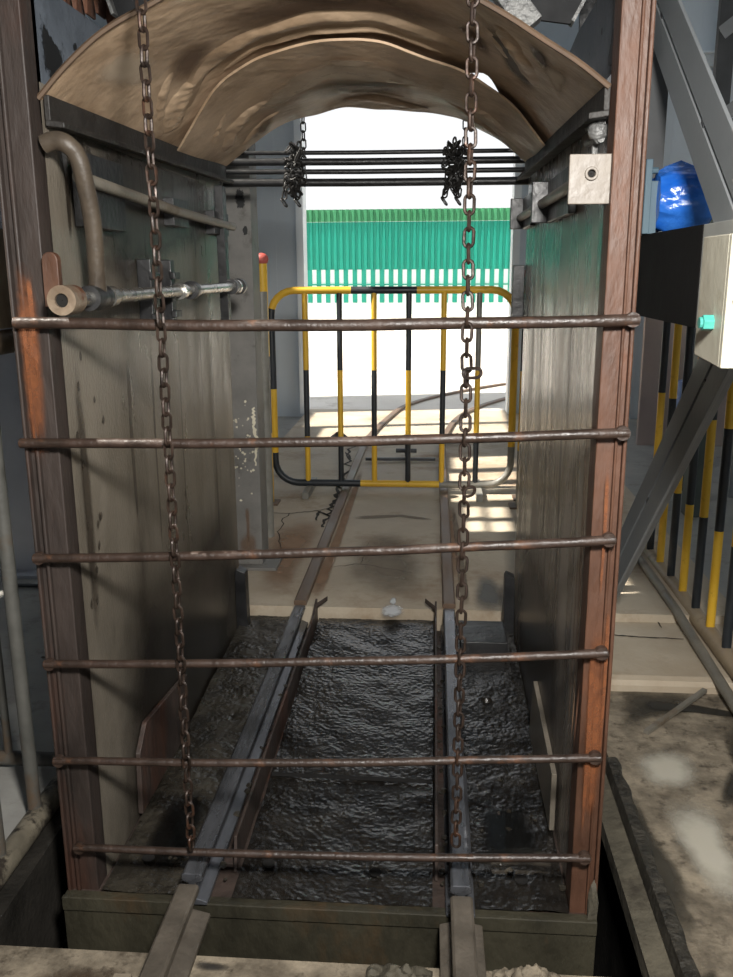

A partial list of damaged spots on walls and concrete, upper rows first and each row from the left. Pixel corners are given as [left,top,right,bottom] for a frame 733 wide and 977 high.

rust [20,282,35,317]
rust [22,329,42,438]
crack [277,446,356,549]
spalling [365,963,433,977]
spalling [492,963,561,977]